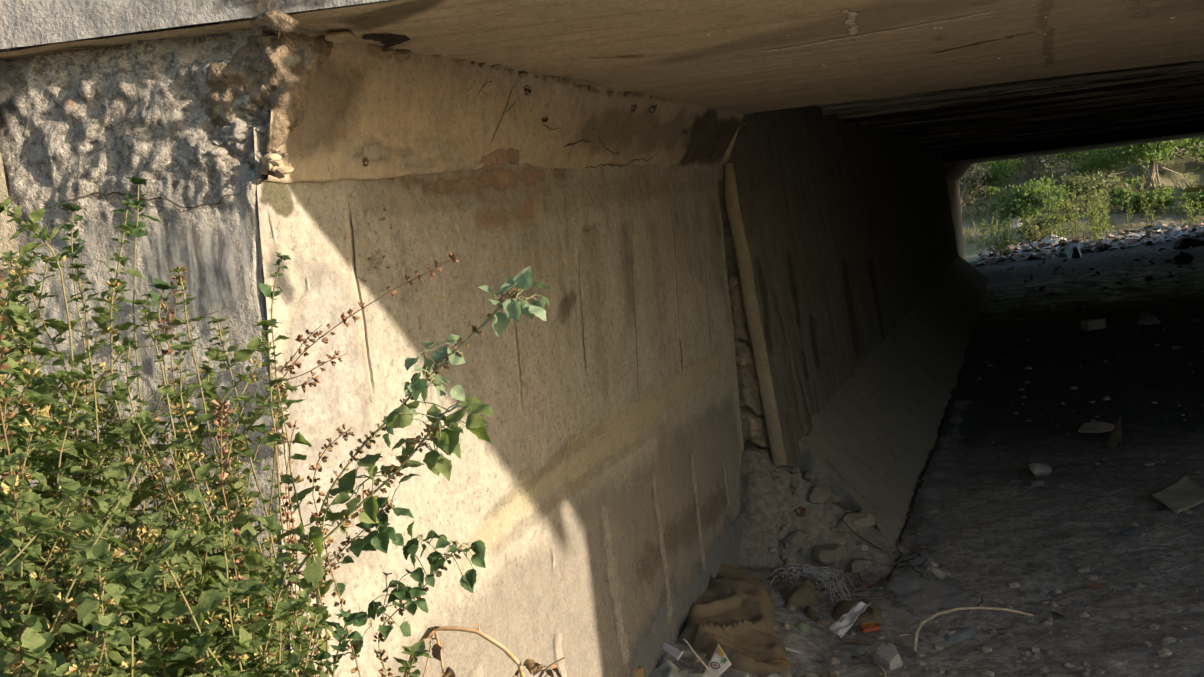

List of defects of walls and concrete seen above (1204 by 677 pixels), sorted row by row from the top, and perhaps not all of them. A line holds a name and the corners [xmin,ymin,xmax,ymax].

spalling [208,115,294,179]
crack [543,125,657,168]
crack [54,190,242,209]
water stain [141,207,277,317]
water stain [125,282,145,359]